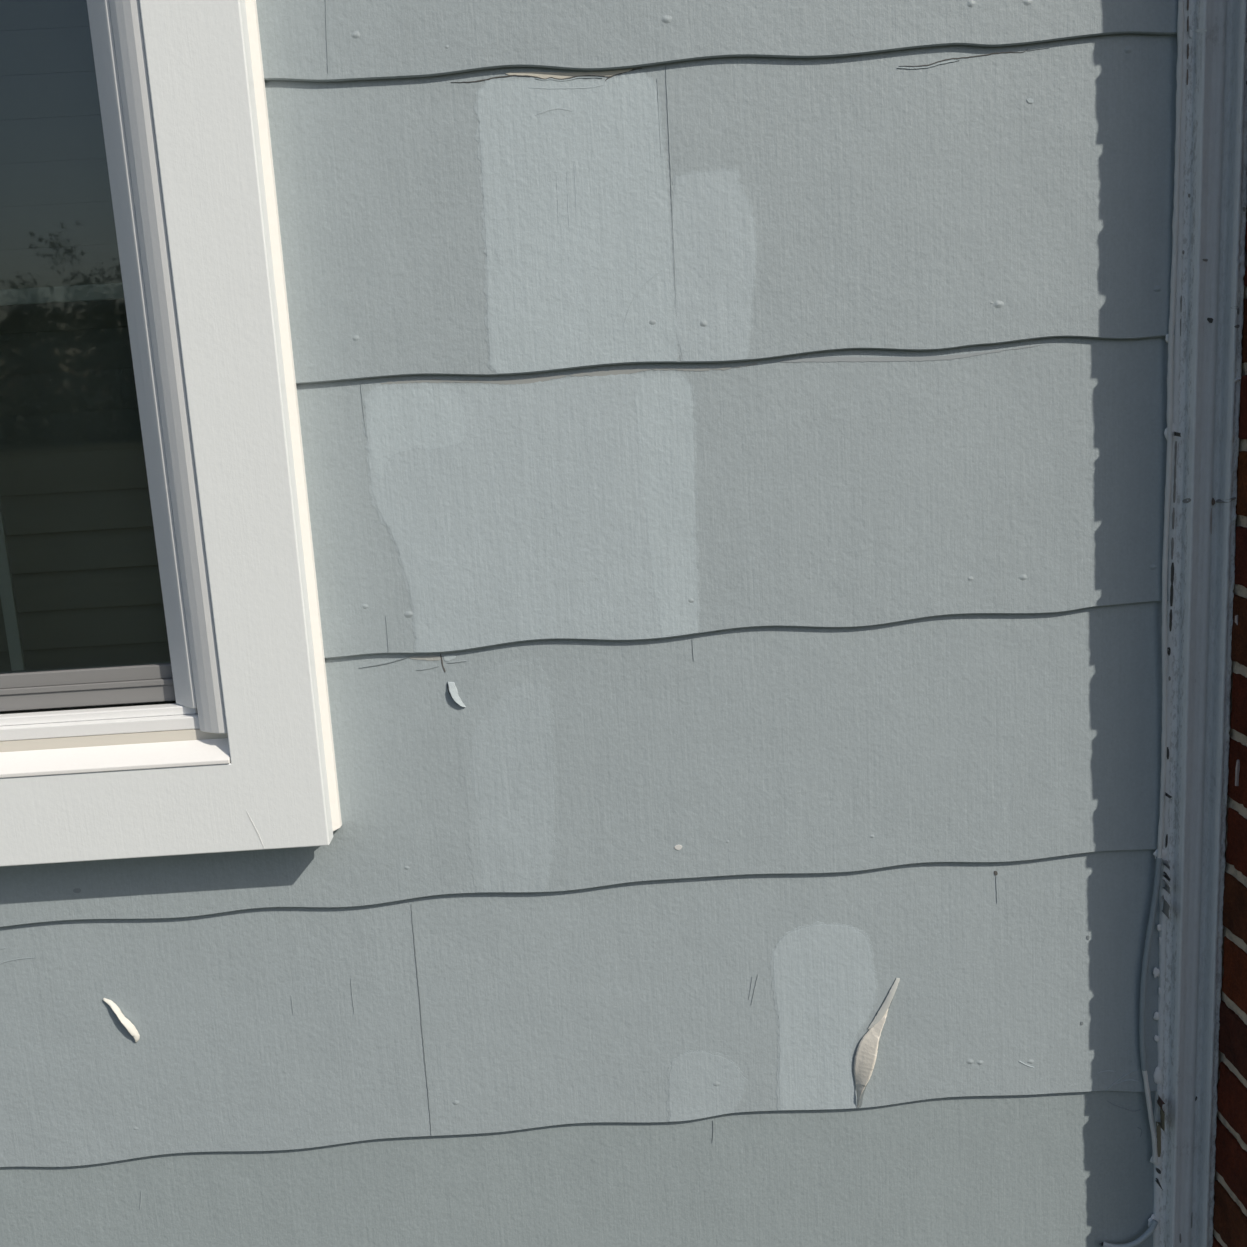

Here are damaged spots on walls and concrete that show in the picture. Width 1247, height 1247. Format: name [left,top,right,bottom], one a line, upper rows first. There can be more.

peeling [448,682,466,707]
peeling [854,1010,888,1108]